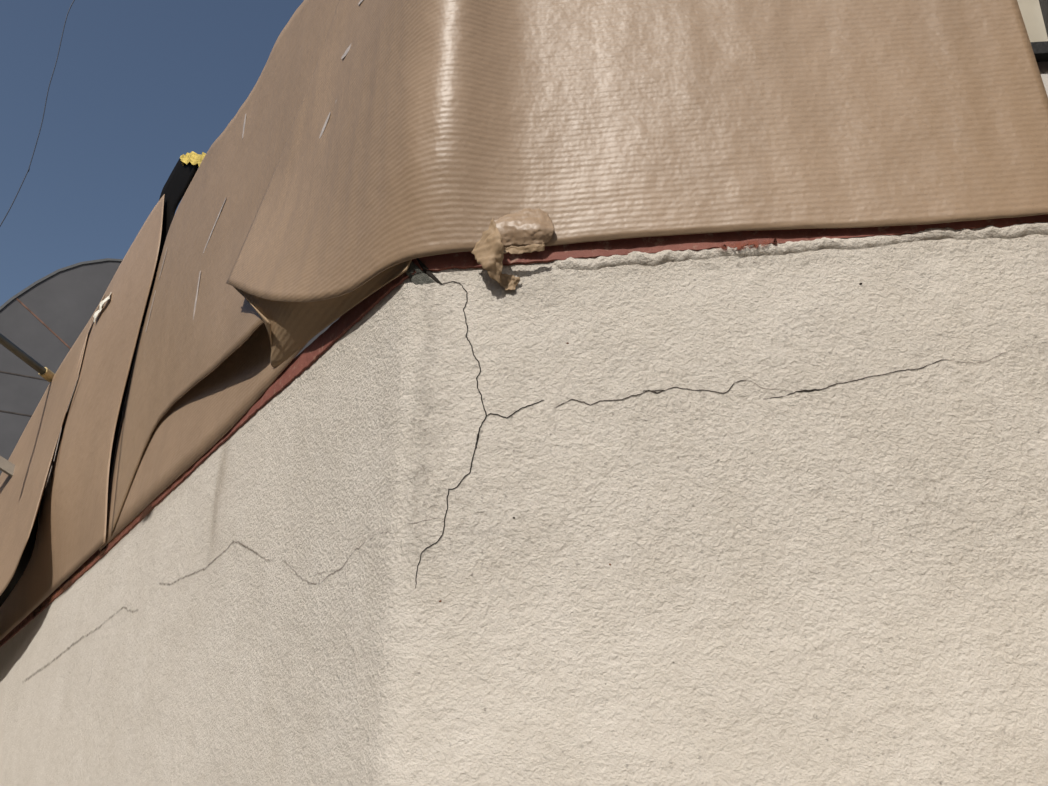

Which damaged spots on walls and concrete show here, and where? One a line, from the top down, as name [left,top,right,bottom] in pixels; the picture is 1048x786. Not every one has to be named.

flaking render [406,258,442,285]
crack [766,359,946,399]
crack [415,272,746,588]